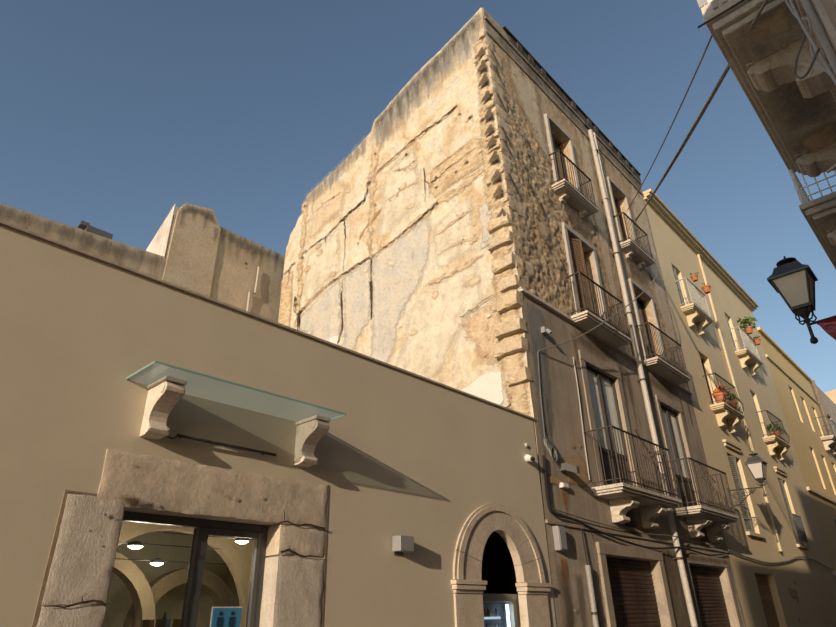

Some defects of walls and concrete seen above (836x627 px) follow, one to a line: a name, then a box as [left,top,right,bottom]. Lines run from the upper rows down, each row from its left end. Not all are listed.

water stain [376,15,477,139]
flaking render [279,39,518,327]
crack [279,183,369,343]
crack [366,259,374,318]
flaking render [428,244,529,415]
crack [44,594,107,608]
crack [278,502,326,530]
crack [281,548,323,558]